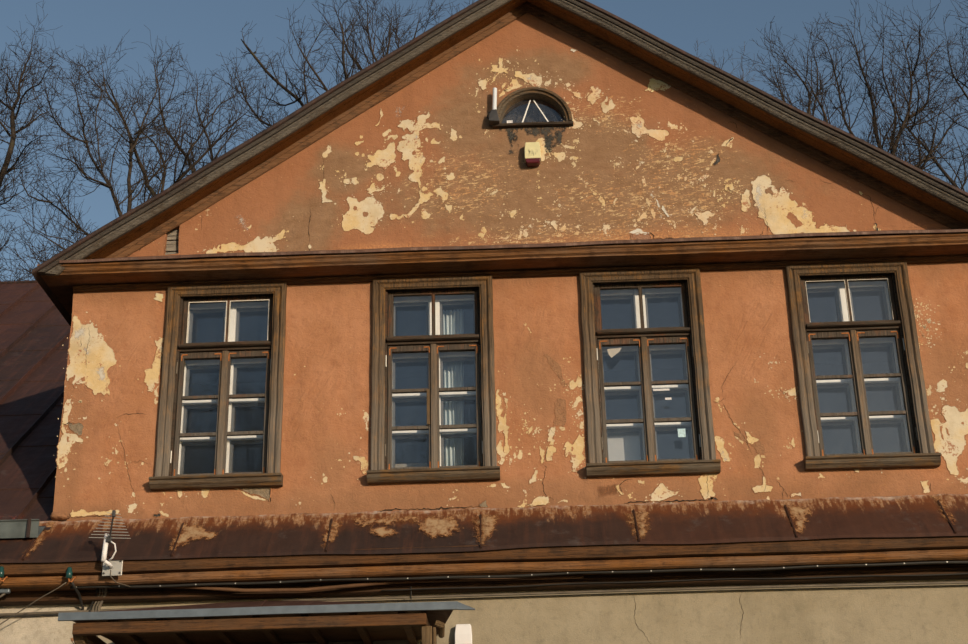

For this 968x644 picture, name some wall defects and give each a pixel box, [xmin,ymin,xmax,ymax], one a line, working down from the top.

peeling [318,108,464,235]
peeling [469,49,856,244]
peeling [137,337,164,404]
peeling [55,312,121,497]
flaking render [495,353,587,507]
peeling [926,350,968,489]
rust [170,523,216,550]
rust [323,521,342,545]
rust [354,516,460,538]
rust [473,514,498,544]
rust [627,511,650,539]
rust [786,505,811,533]